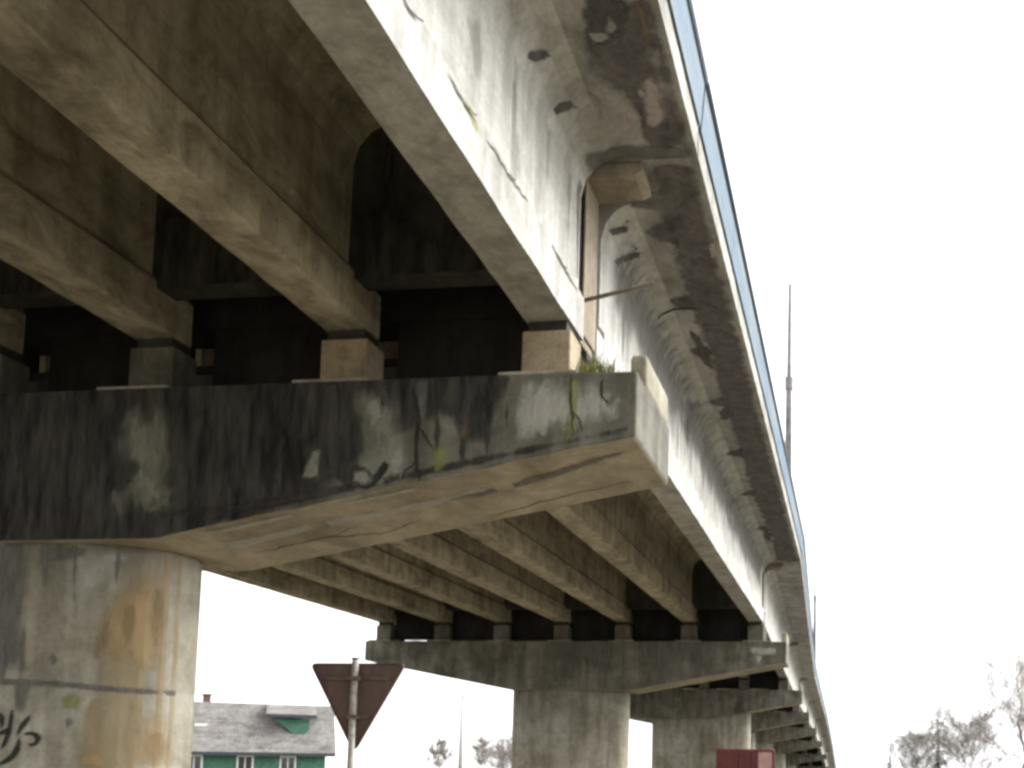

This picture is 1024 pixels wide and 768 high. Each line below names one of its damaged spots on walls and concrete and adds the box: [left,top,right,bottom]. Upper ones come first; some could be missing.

spalling [528,50,550,62]
spalling [554,101,575,115]
damp [586,0,796,581]
crack [400,389,434,481]
damp [506,383,614,443]
damp [512,453,621,487]
damp [0,375,553,709]
rust [80,561,182,768]